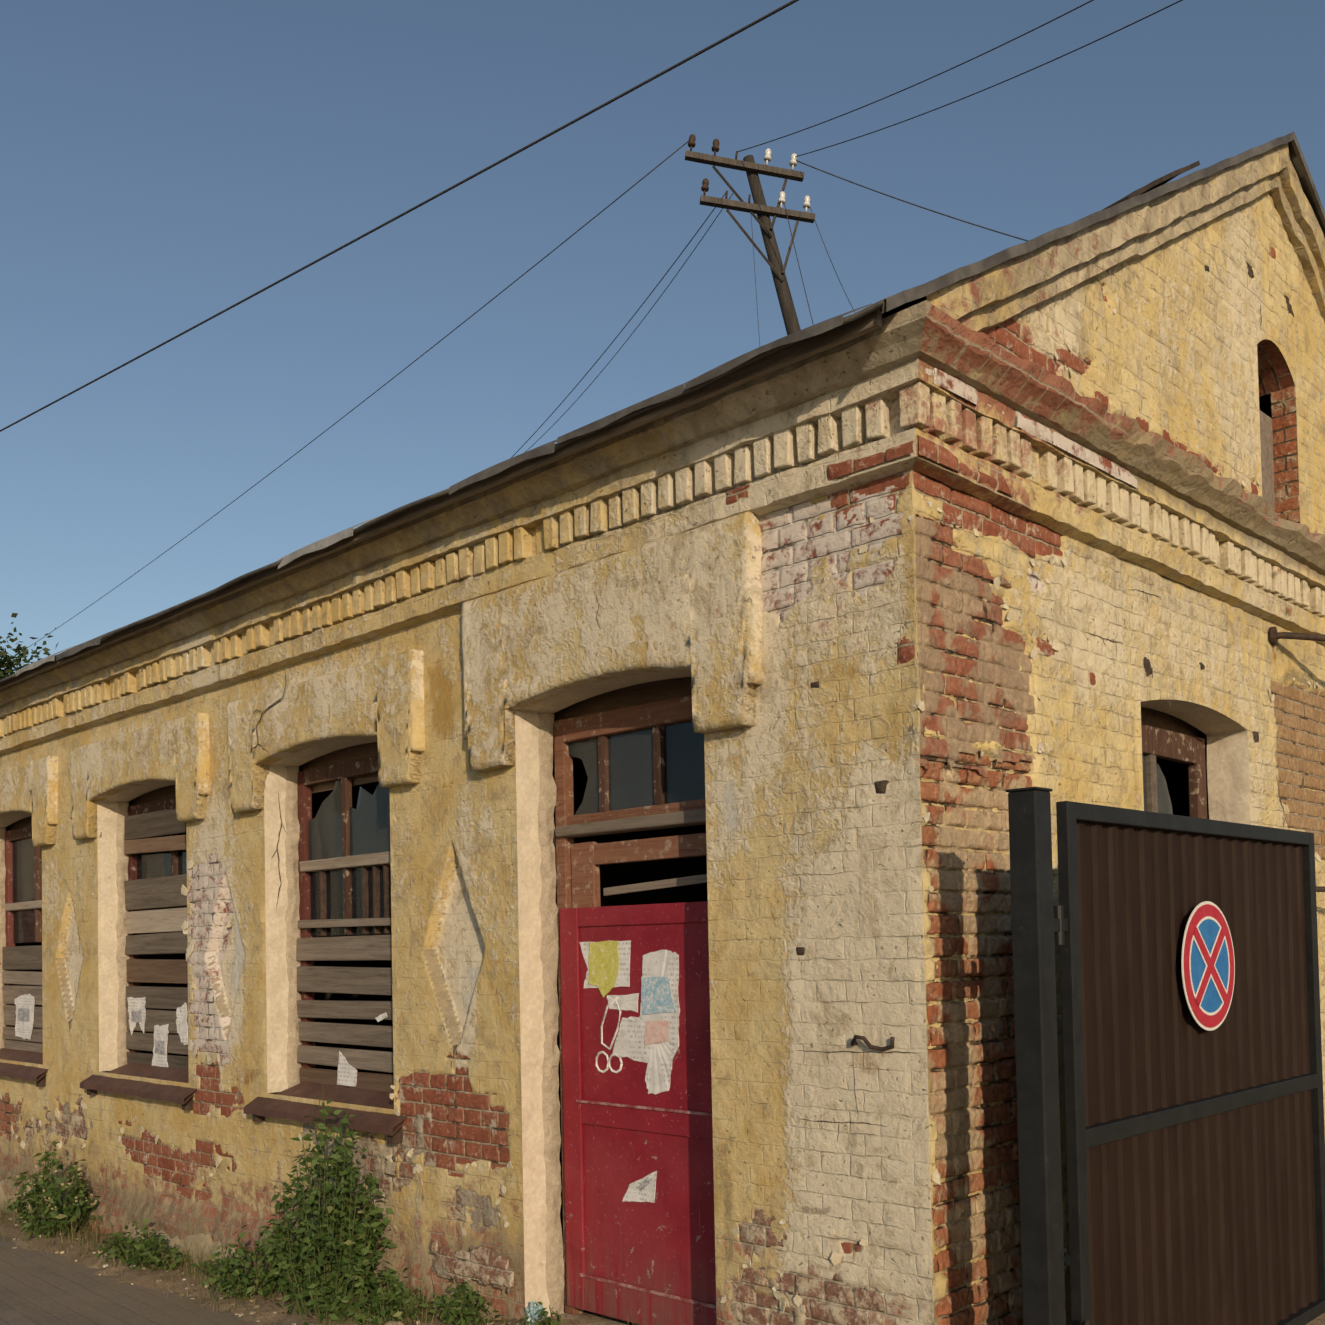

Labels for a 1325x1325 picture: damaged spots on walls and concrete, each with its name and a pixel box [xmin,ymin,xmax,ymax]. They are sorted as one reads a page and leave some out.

flaking render [982,317,1091,377]
peeling [925,368,1139,489]
flaking render [1095,391,1222,477]
crack [252,673,287,751]
flaking render [1268,677,1325,862]
spalling [759,435,1070,1325]
peeling [181,853,247,1119]
spalling [0,1091,93,1152]
spalling [118,1120,236,1203]
spalling [299,1046,514,1293]
peeling [720,1208,885,1325]